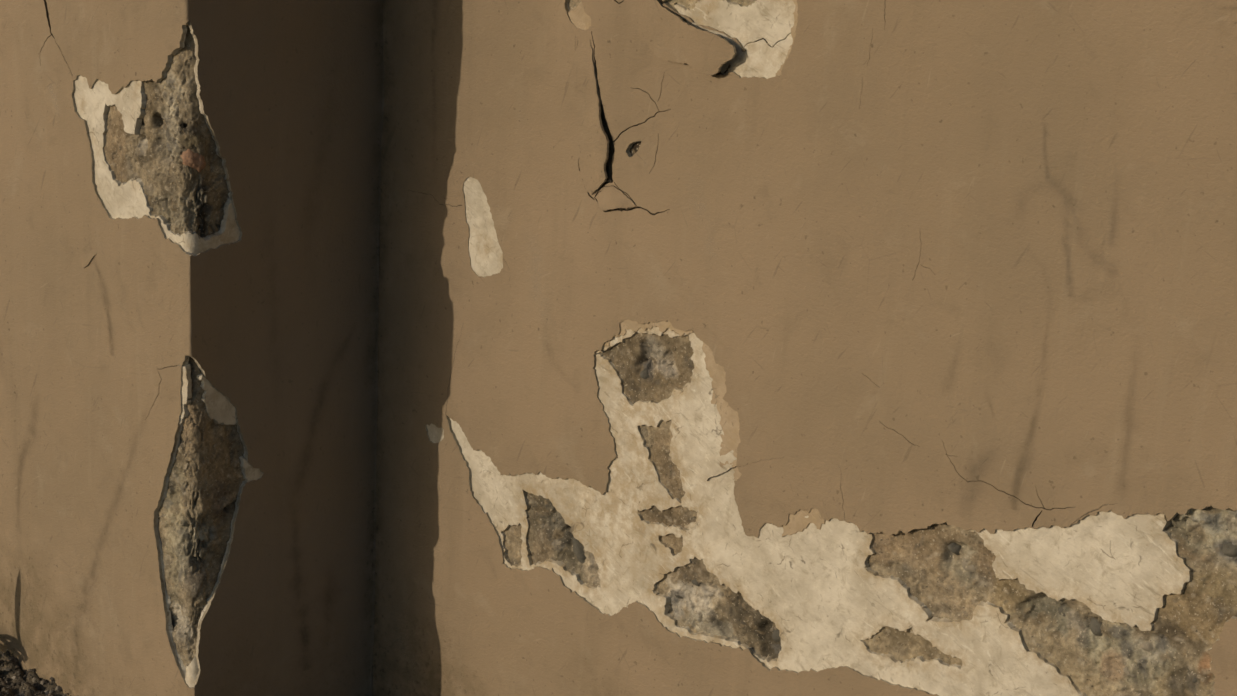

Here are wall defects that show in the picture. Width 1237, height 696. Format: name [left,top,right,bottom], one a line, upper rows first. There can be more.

flaking render [67,25,241,255]
peeling [464,177,507,277]
crack [575,31,670,215]
flaking render [619,0,798,79]
flaking render [156,356,262,687]
flaking render [427,320,1237,696]